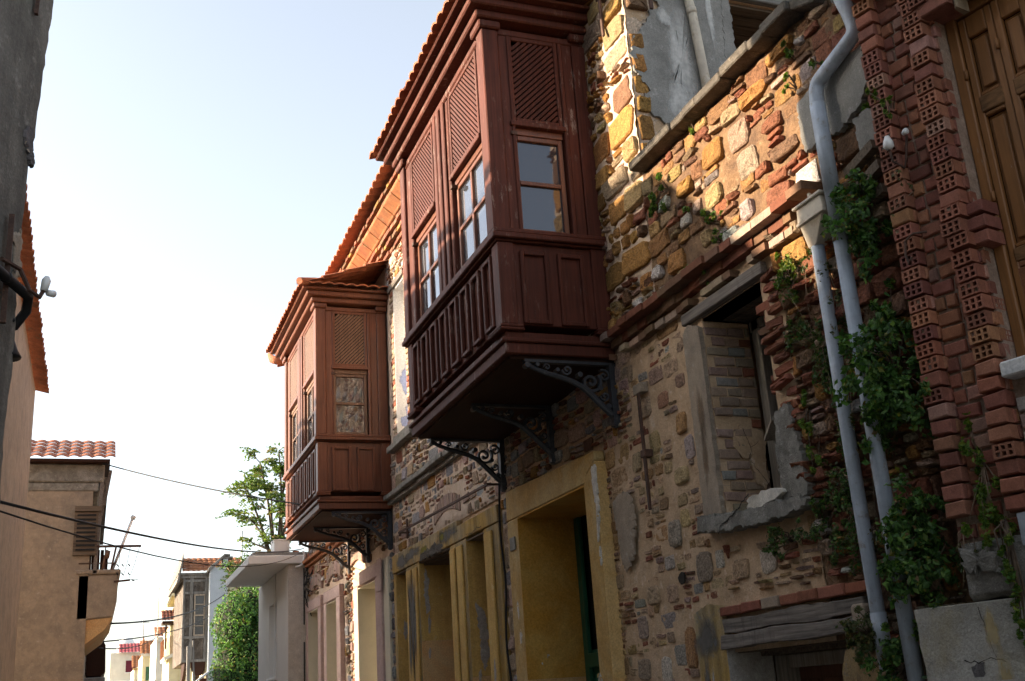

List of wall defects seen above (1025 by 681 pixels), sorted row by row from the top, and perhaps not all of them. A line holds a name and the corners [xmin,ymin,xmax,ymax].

flaking render [971,662,986,677]